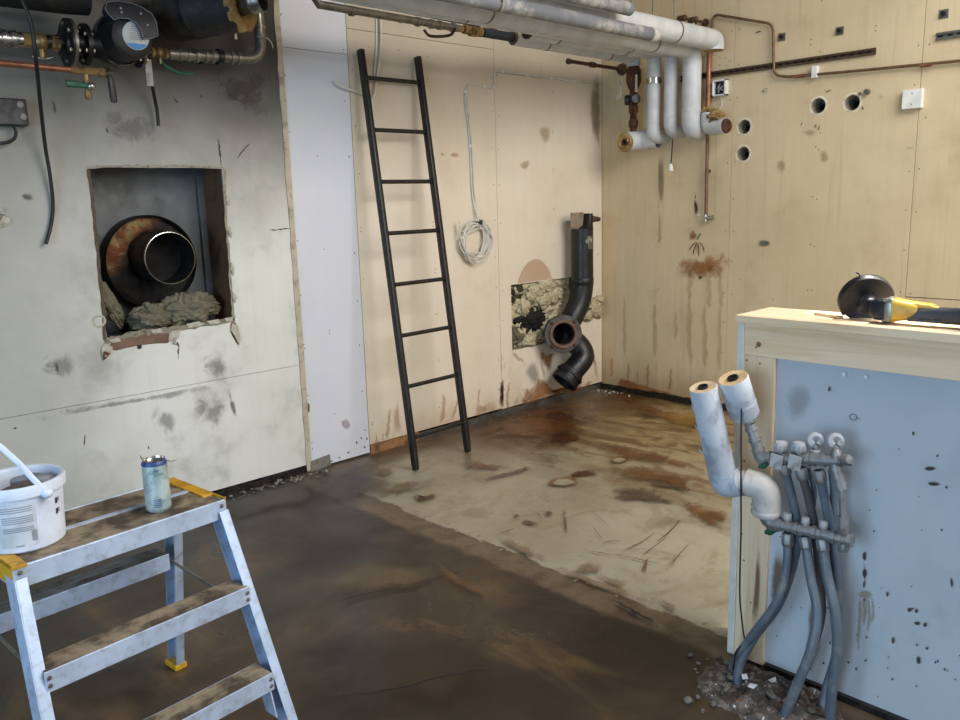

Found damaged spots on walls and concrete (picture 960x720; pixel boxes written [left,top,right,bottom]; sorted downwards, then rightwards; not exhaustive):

rust [682,232,720,279]
spalling [513,307,549,334]